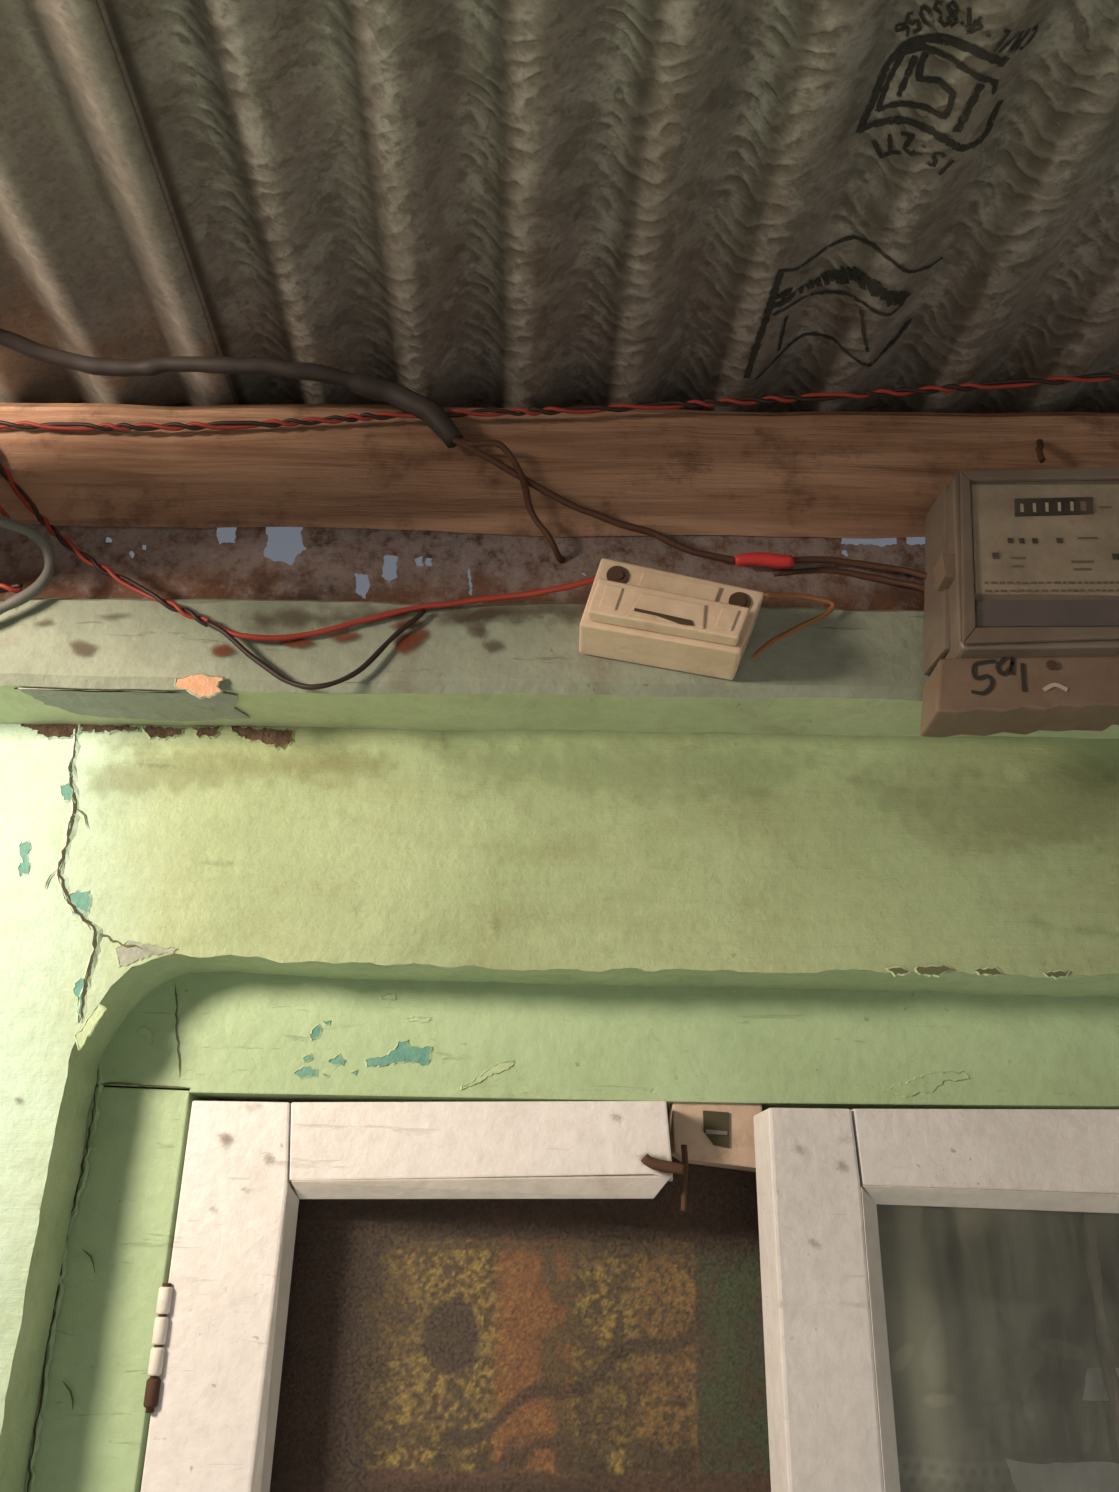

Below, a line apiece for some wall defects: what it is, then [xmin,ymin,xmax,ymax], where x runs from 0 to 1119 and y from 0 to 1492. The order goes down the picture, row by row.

rust [0,524,925,653]
rust [70,642,93,655]
rust [212,645,232,656]
peeling [14,673,299,751]
crack [45,728,142,1023]
peeling [292,1016,434,1079]
crack [27,986,188,1492]